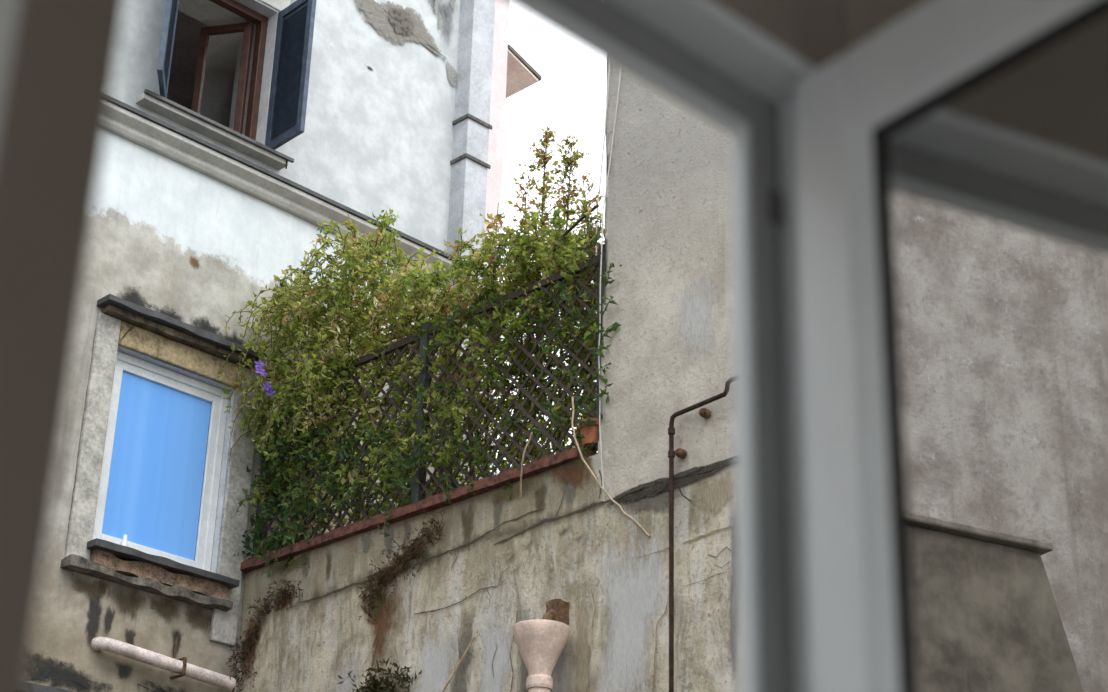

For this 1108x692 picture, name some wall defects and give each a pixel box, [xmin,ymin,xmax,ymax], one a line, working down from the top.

spalling [354,0,458,86]
leakage [122,288,244,346]
crack [290,470,606,614]
leakage [461,505,472,541]
leakage [535,485,545,511]
leakage [74,578,212,645]
leakage [28,654,111,692]
leakage [119,664,133,678]